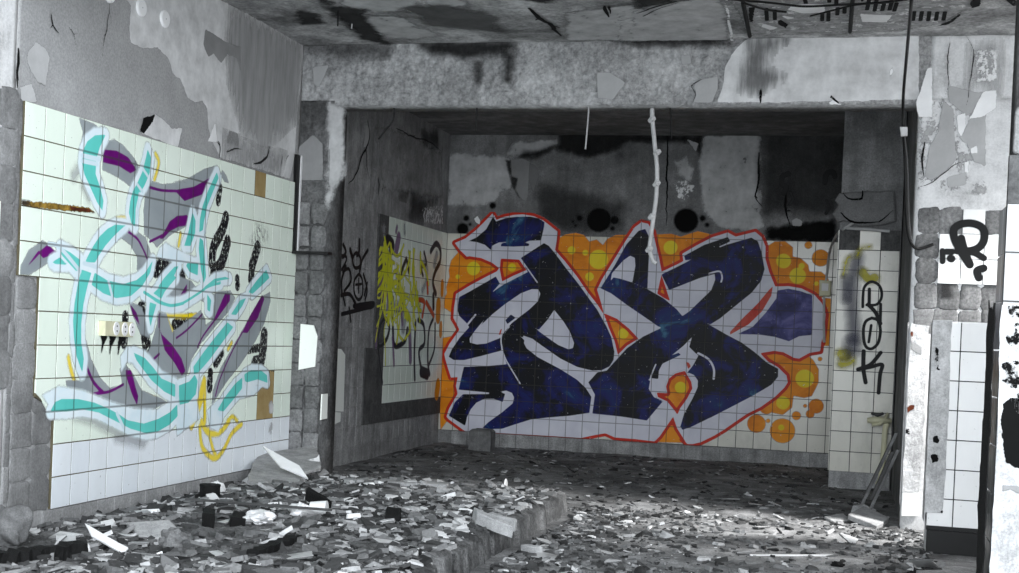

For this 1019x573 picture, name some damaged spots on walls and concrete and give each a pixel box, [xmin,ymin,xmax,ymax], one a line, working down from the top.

flaking render [20,42,50,103]
flaking render [126,0,304,179]
spalling [725,0,981,41]
peeling [916,47,1002,194]